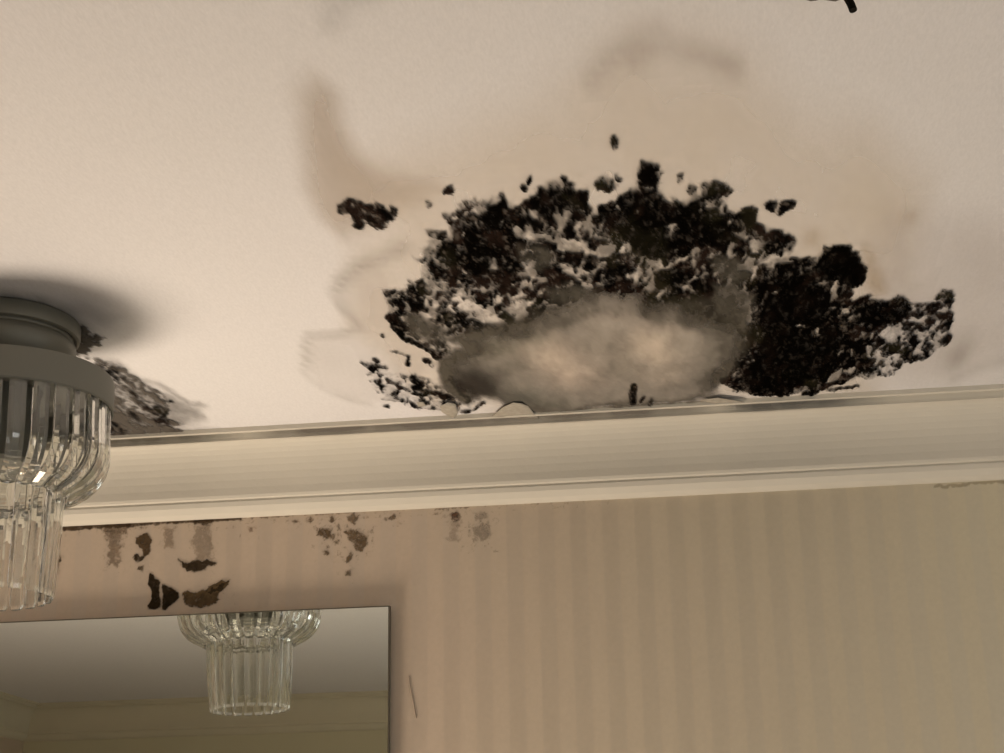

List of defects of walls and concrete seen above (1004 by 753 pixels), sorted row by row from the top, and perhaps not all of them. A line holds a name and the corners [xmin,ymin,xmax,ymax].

damp [337,199,397,231]
damp [360,161,955,414]
damp [76,326,186,436]